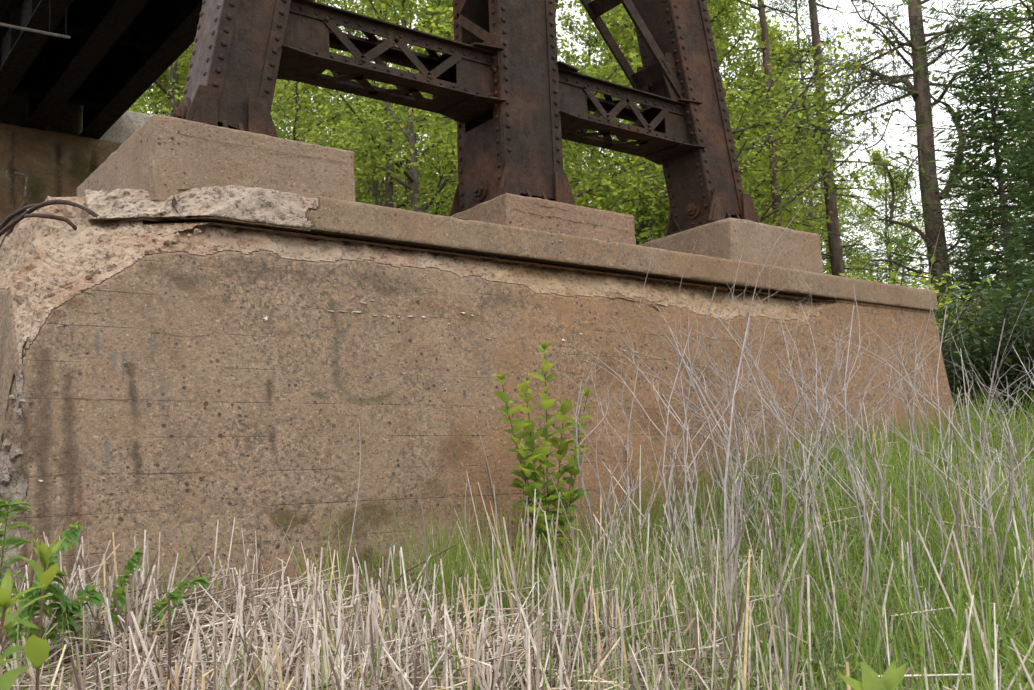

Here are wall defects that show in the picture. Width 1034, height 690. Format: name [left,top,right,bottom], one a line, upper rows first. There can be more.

spalling [0,185,833,611]